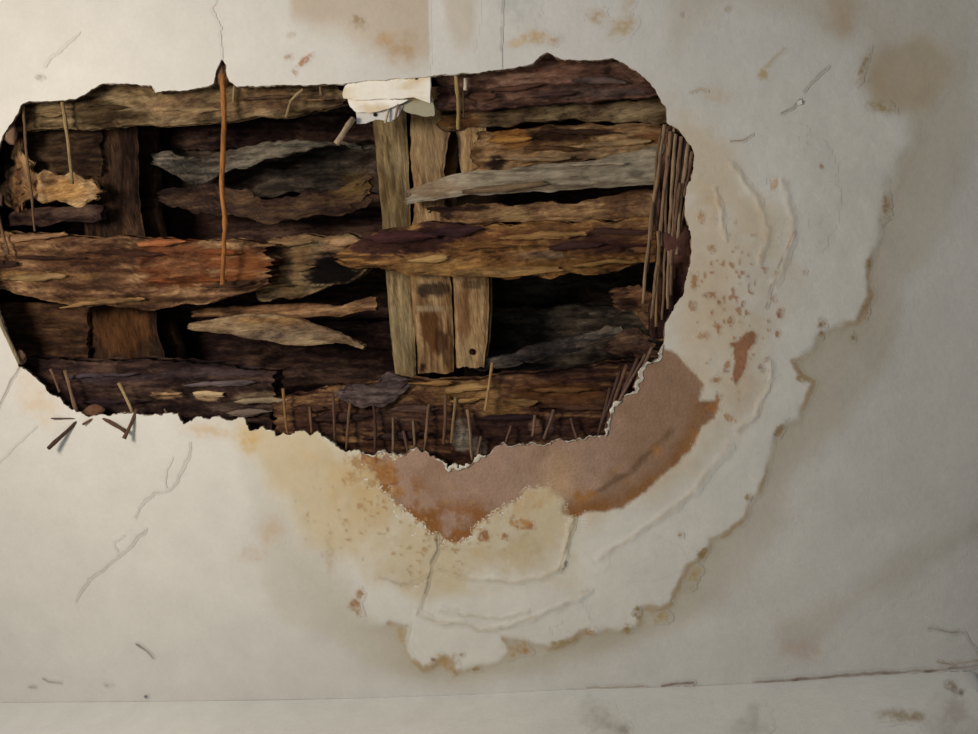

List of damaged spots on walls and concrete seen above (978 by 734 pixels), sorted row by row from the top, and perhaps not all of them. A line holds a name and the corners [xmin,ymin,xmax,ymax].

water stain [12,362,72,435]
flaking render [0,52,771,548]
water stain [174,0,978,695]
flaking render [774,307,785,338]